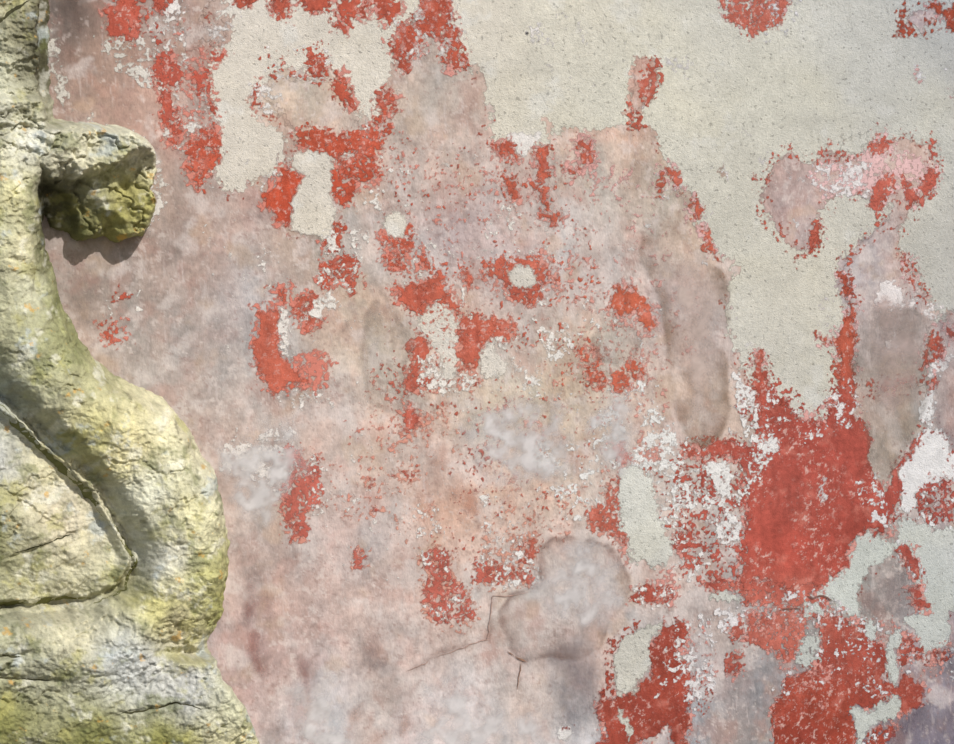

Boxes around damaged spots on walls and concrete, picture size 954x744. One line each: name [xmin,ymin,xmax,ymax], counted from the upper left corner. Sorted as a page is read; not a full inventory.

spalling [48,29,70,106]
spalling [147,152,169,229]
peeling [391,152,419,207]
flaking render [477,239,601,310]
peeling [219,421,428,544]
peeling [346,545,371,580]
peeling [414,435,548,634]
leakage [553,548,611,624]
crack [406,592,528,689]
peeling [593,617,719,744]
peeling [724,649,746,682]